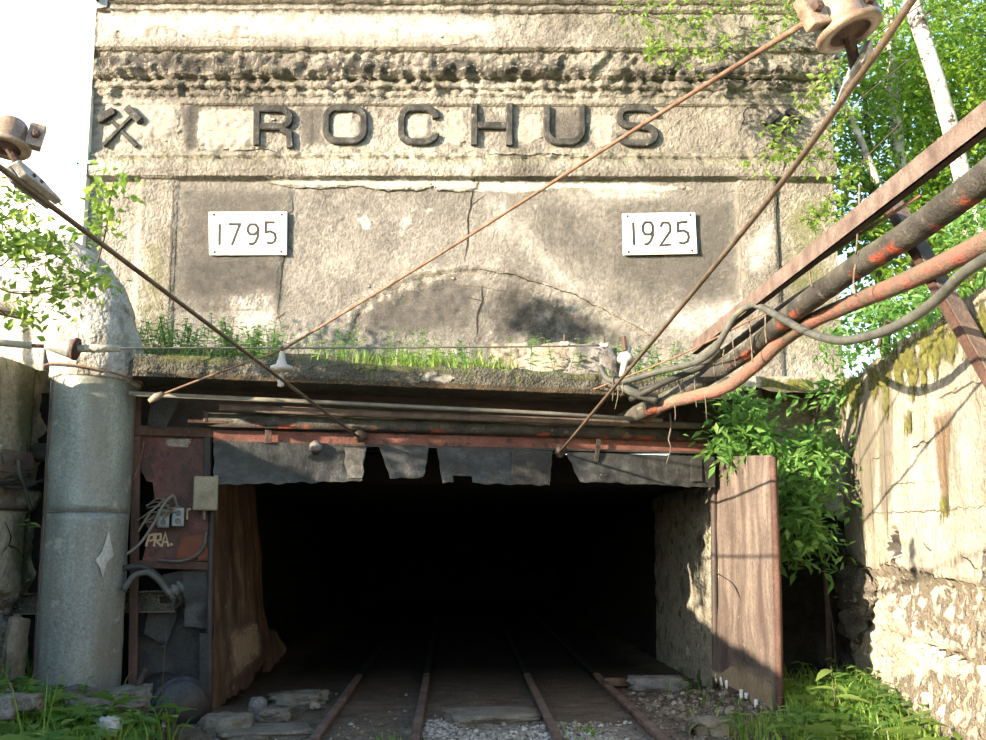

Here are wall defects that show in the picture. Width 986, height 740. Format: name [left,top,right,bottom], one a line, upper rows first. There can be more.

crack [249,244,295,340]
crack [268,175,652,342]
rust [262,377,509,390]
rust [525,387,627,395]
rust [166,439,190,447]
leakage [849,382,892,542]
spalling [781,526,986,740]